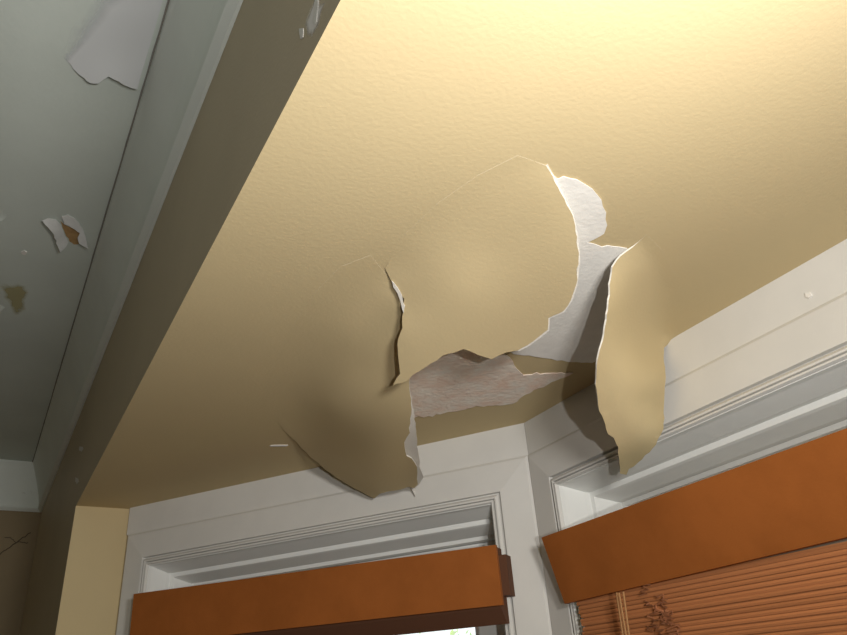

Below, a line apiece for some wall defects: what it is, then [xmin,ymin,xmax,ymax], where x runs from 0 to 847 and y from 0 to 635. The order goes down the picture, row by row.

spalling [299,0,323,39]
peeling [67,0,163,89]
peeling [42,215,88,252]
water stain [5,287,26,312]
peeling [262,156,684,498]